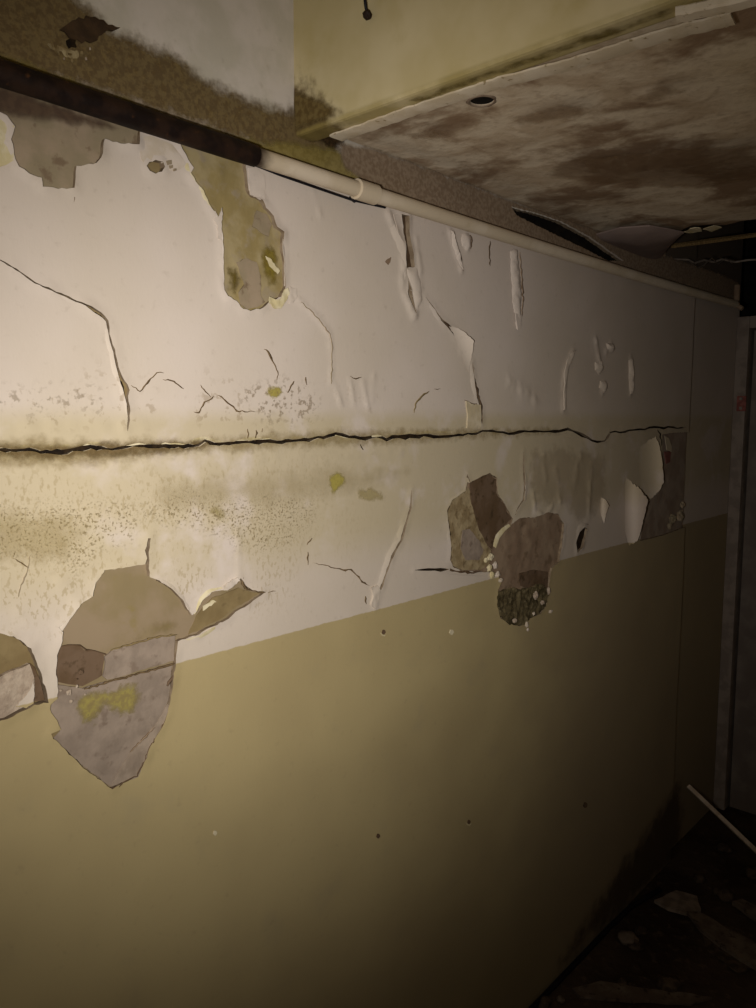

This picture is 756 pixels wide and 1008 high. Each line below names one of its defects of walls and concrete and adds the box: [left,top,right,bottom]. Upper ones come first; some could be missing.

flaking render [0,88,139,201]
leakage [0,0,361,179]
flaking render [166,145,297,310]
peeling [385,214,422,310]
peeling [510,249,524,330]
crack [0,264,681,455]
mould [2,512,130,560]
leakage [0,441,215,462]
crack [307,508,410,609]
flaking render [446,473,589,631]
flaking render [625,432,687,545]
flaking render [0,547,273,789]